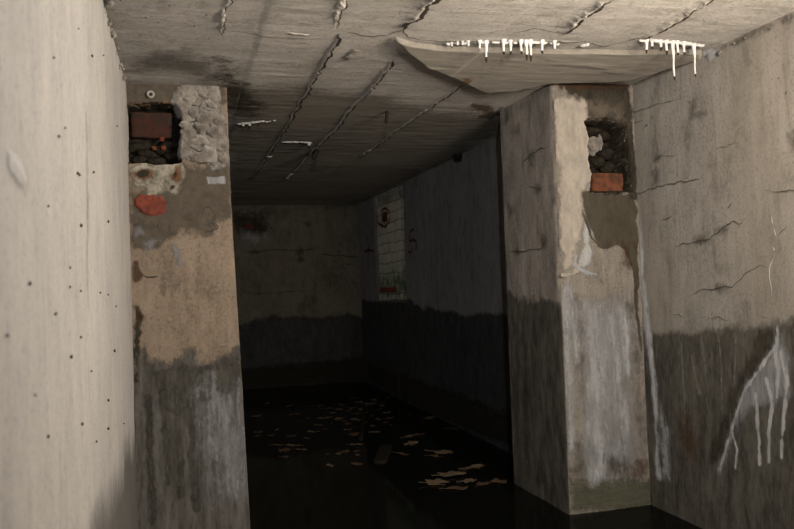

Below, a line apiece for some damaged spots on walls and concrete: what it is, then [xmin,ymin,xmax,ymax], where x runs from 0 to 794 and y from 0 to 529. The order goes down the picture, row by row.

crack [348,30,460,42]
crack [488,28,644,47]
water stain [638,39,704,47]
spalling [127,102,182,165]
spalling [584,117,634,195]
spalling [134,194,167,216]
water stain [96,83,794,529]